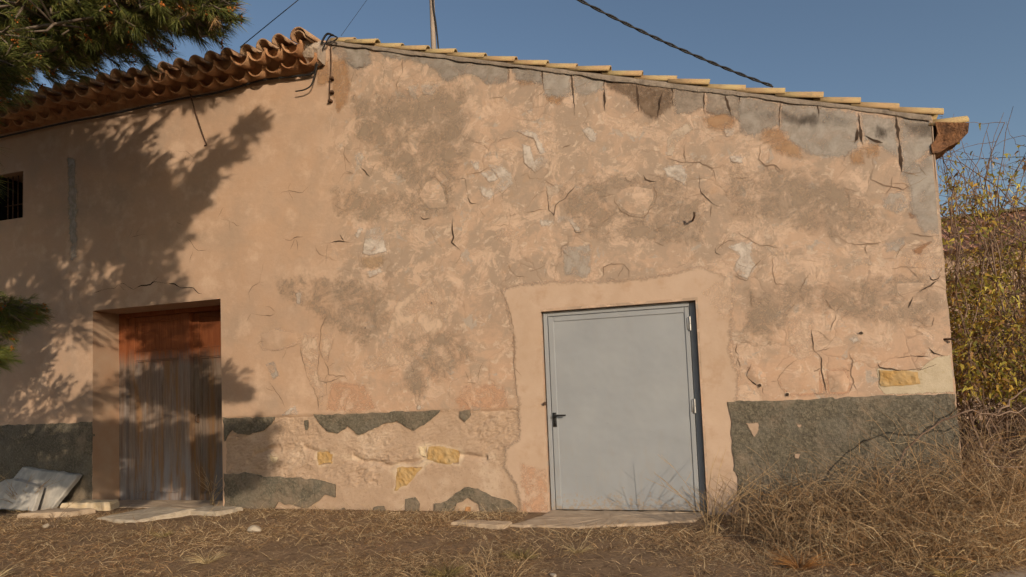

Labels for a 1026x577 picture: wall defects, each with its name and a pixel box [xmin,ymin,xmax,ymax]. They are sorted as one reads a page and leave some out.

crack [536,71,606,114]
crack [632,83,674,117]
crack [703,92,740,128]
crack [759,104,781,171]
crack [835,114,926,216]
crack [98,278,201,294]
crack [285,205,349,261]
crack [420,137,720,400]
crack [715,230,862,395]
crack [828,232,943,328]
crack [260,315,347,407]
flaking render [222,405,521,512]